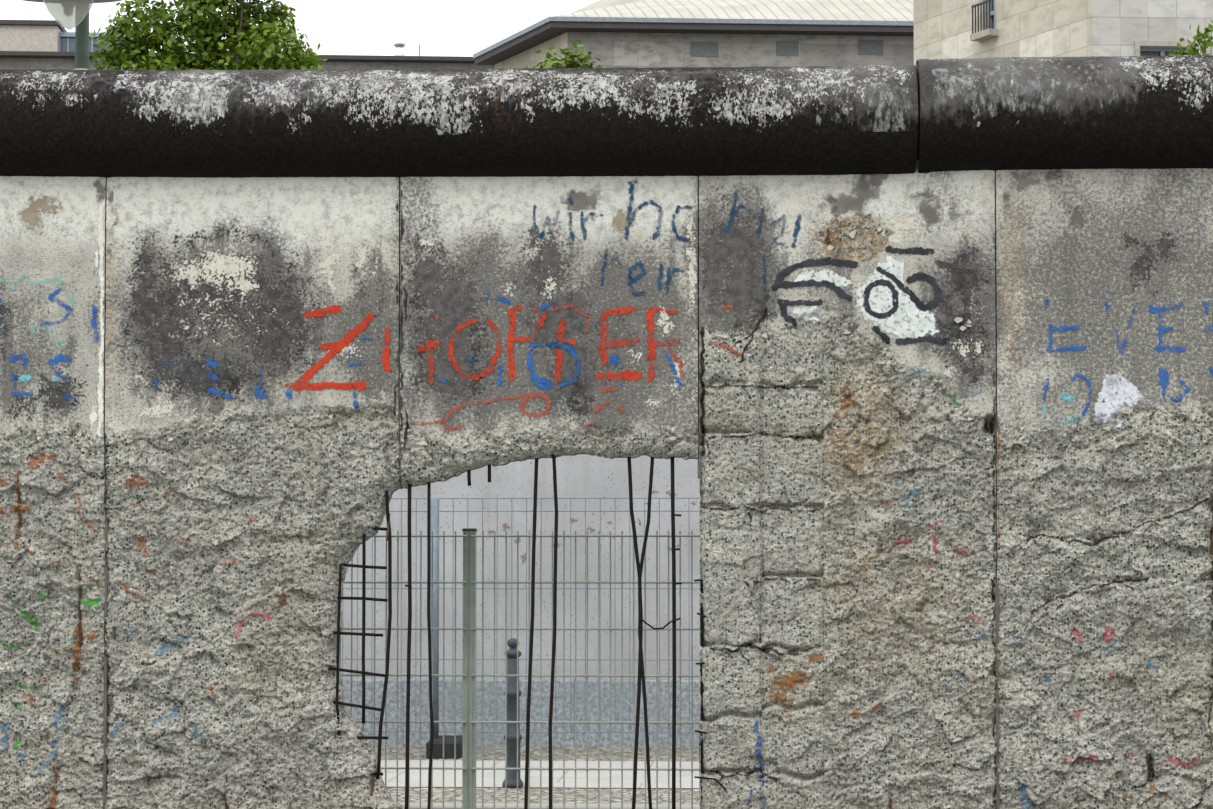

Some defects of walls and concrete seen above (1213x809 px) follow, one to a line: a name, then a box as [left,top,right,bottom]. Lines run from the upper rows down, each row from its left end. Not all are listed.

water stain [93,181,113,202]
water stain [108,213,341,423]
water stain [353,260,392,357]
water stain [401,210,643,433]
rust [0,483,32,550]
spalling [0,201,1213,809]
rust [764,654,827,711]